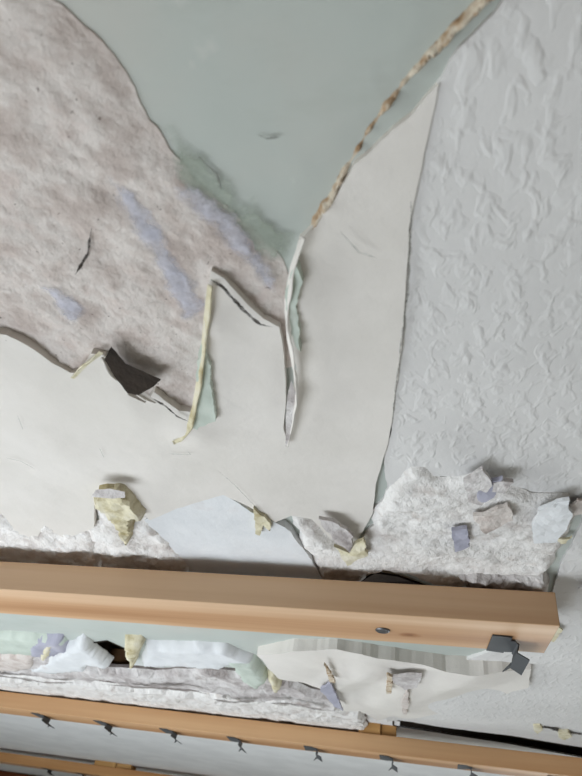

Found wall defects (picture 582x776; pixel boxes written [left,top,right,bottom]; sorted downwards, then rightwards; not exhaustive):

peeling [0,0,582,592]
peeling [0,633,531,732]